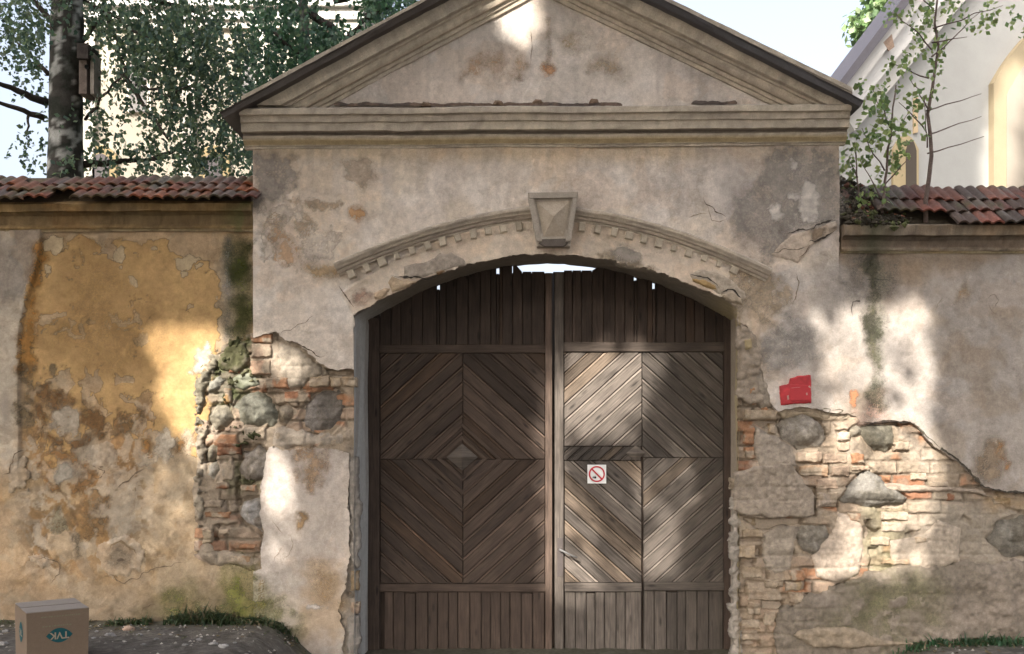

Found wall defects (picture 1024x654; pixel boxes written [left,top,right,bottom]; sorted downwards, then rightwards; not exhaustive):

flaking render [374,253,466,300]
flaking render [597,244,654,270]
flaking render [772,220,840,263]
damp [850,254,897,368]
damp [863,383,883,422]
peeling [16,234,363,654]
spalling [689,270,1024,654]